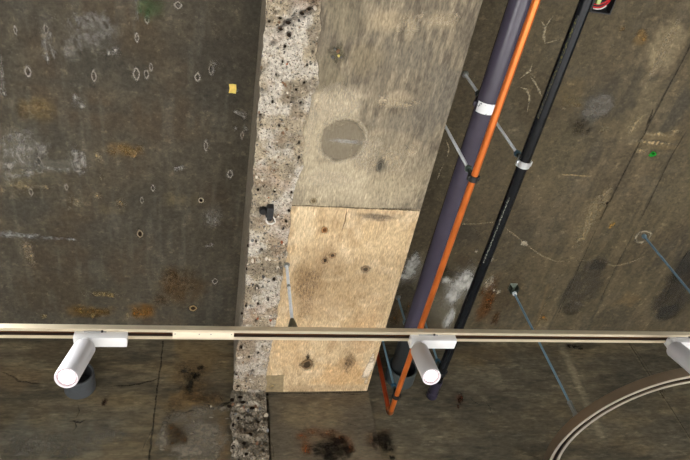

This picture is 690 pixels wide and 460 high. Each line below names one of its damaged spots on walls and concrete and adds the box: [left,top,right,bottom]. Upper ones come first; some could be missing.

water stain [397,255,420,298]
water stain [431,269,473,326]
crack [118,341,230,460]
corrosion [297,430,354,460]